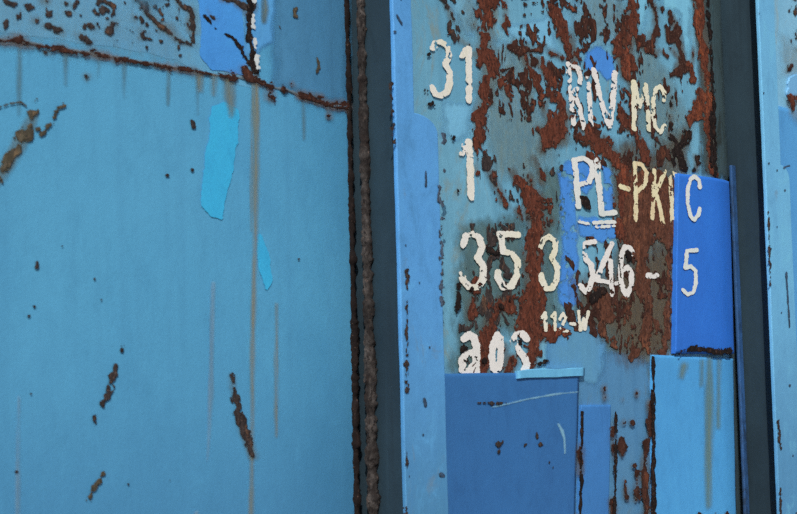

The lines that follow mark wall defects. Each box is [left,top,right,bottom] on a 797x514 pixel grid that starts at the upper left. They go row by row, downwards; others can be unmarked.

rust [0,34,292,208]
rust [298,91,353,118]
rust [445,0,719,373]
rust [679,345,733,355]
rust [610,420,635,456]
rust [624,400,653,514]